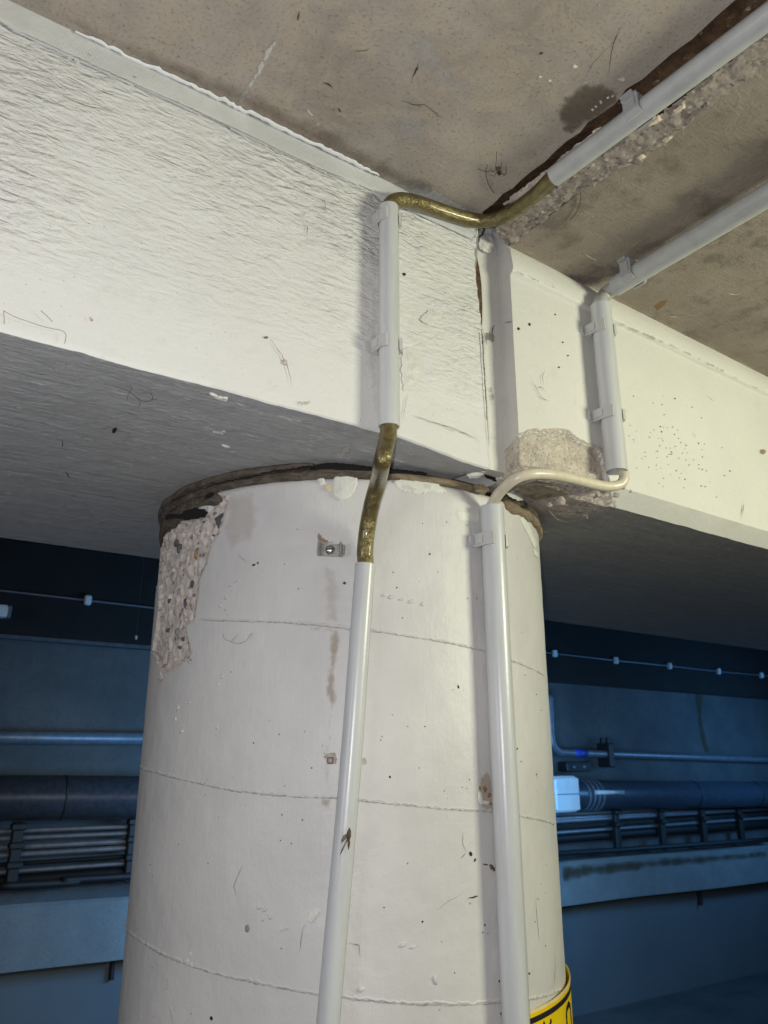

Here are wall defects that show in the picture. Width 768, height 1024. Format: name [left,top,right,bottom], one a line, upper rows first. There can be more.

damp [561,77,625,131]
spalling [495,33,768,246]
crack [169,465,313,505]
spalling [488,428,632,518]
spalling [151,491,230,682]